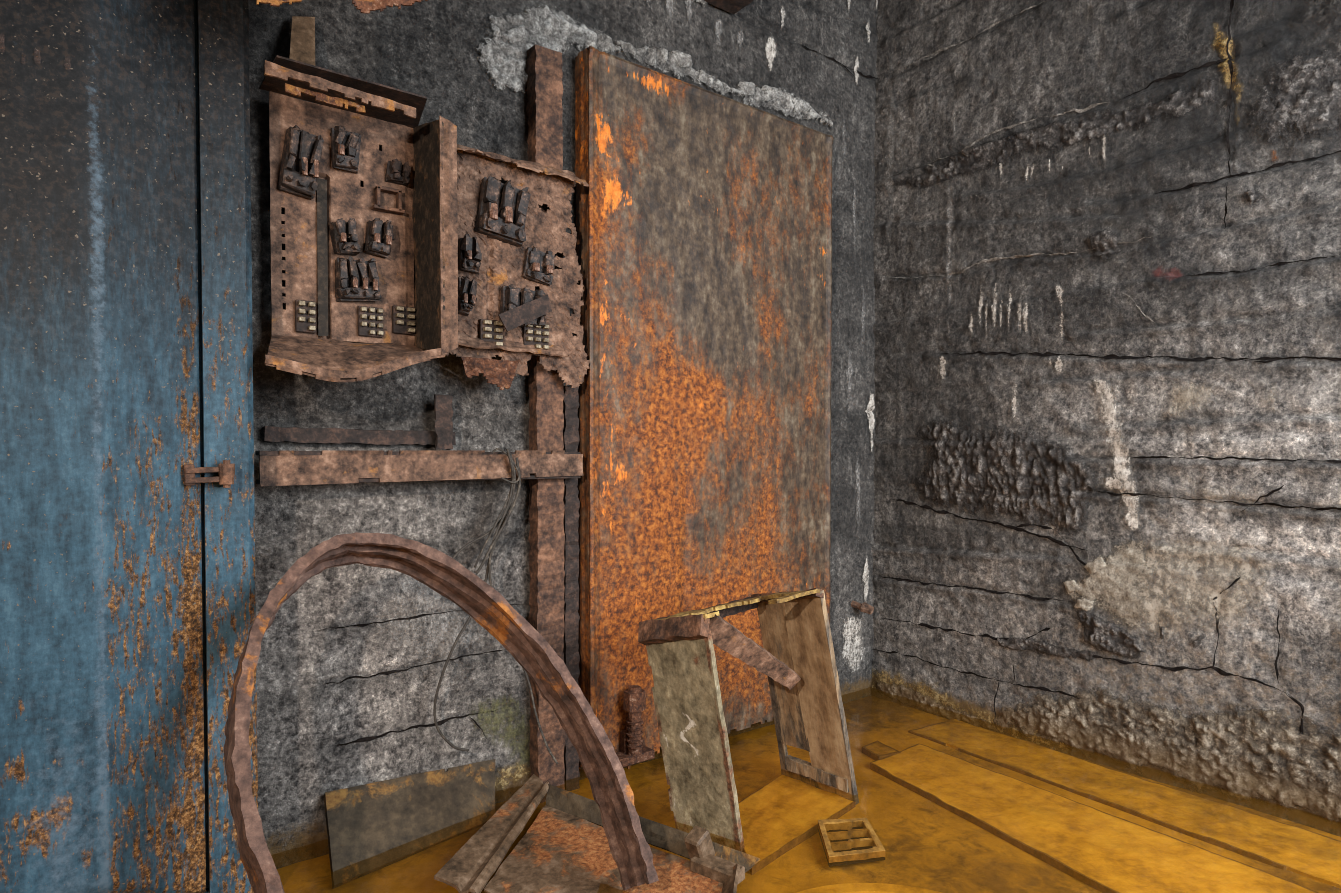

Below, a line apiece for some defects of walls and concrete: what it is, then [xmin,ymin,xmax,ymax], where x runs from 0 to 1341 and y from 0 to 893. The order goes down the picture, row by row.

spalling [476,3,833,127]
crack [798,0,1048,79]
crack [882,0,1341,229]
crack [888,237,1151,279]
crack [1194,254,1340,275]
crack [944,351,1341,363]
damp [1094,379,1140,530]
crack [894,499,1087,565]
crack [319,610,464,631]
crack [326,650,502,684]
crack [872,576,1304,734]
crack [337,706,511,746]